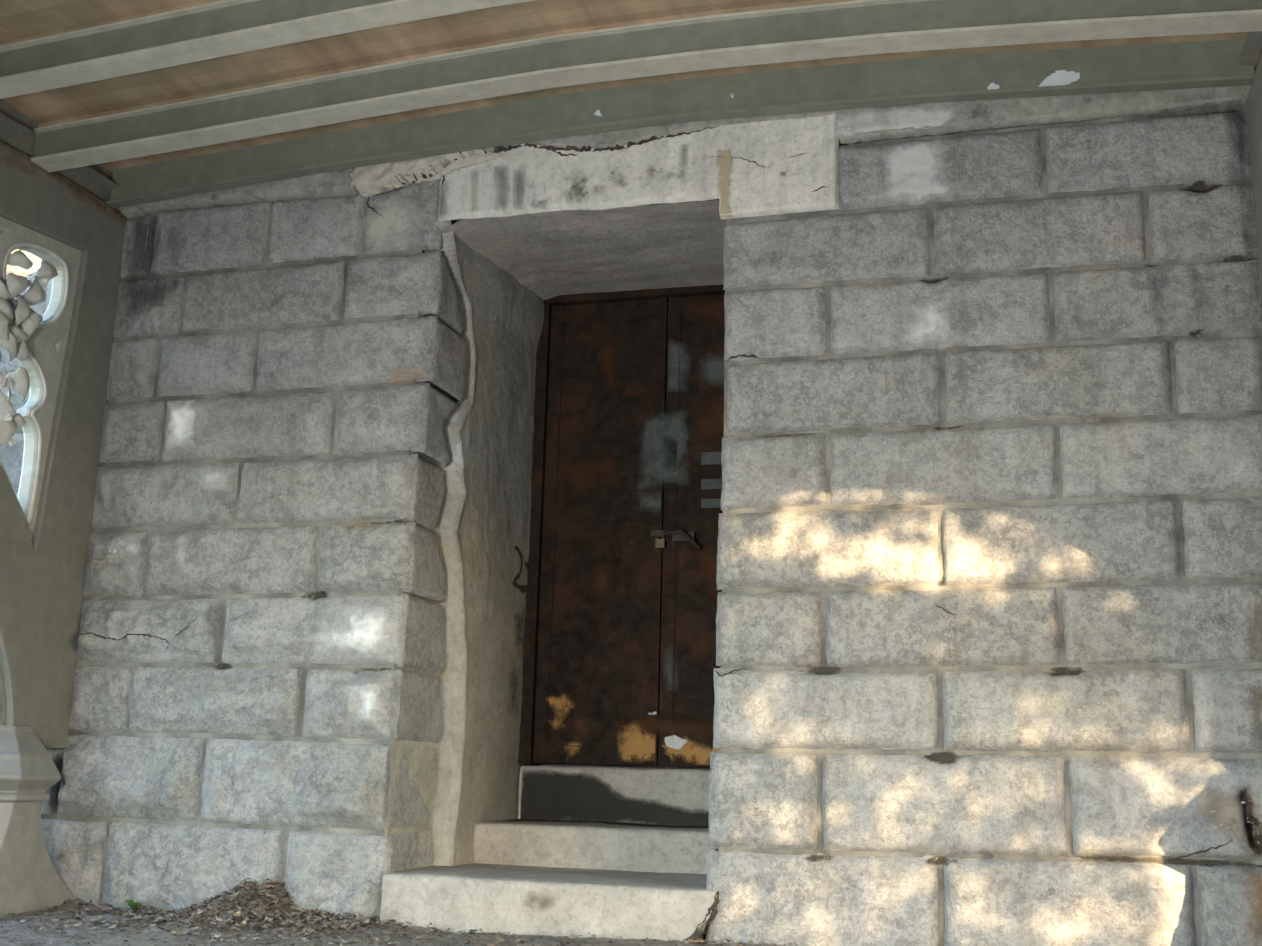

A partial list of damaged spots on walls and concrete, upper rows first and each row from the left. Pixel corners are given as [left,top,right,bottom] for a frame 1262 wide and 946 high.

spalling [350,149,501,198]
crack [353,126,808,217]
crack [80,615,202,650]
spalling [1199,788,1262,854]
crack [683,891,719,941]